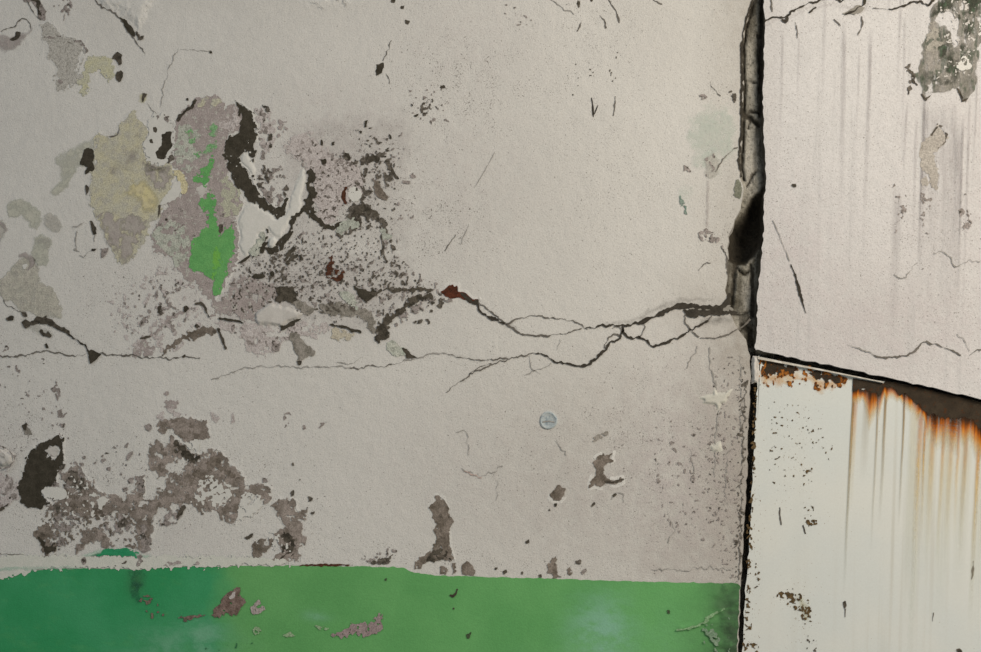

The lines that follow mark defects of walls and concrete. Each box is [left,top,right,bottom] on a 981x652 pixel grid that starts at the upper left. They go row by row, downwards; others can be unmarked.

peeling [23,0,123,96]
crack [700,0,934,199]
peeling [905,0,981,102]
peeling [52,49,482,365]
crack [894,251,980,279]
crack [0,312,200,364]
crack [851,333,981,359]
crack [212,247,751,582]
peeling [0,387,349,567]
peeling [413,492,475,576]
peeling [587,431,626,503]
rust [742,359,981,652]